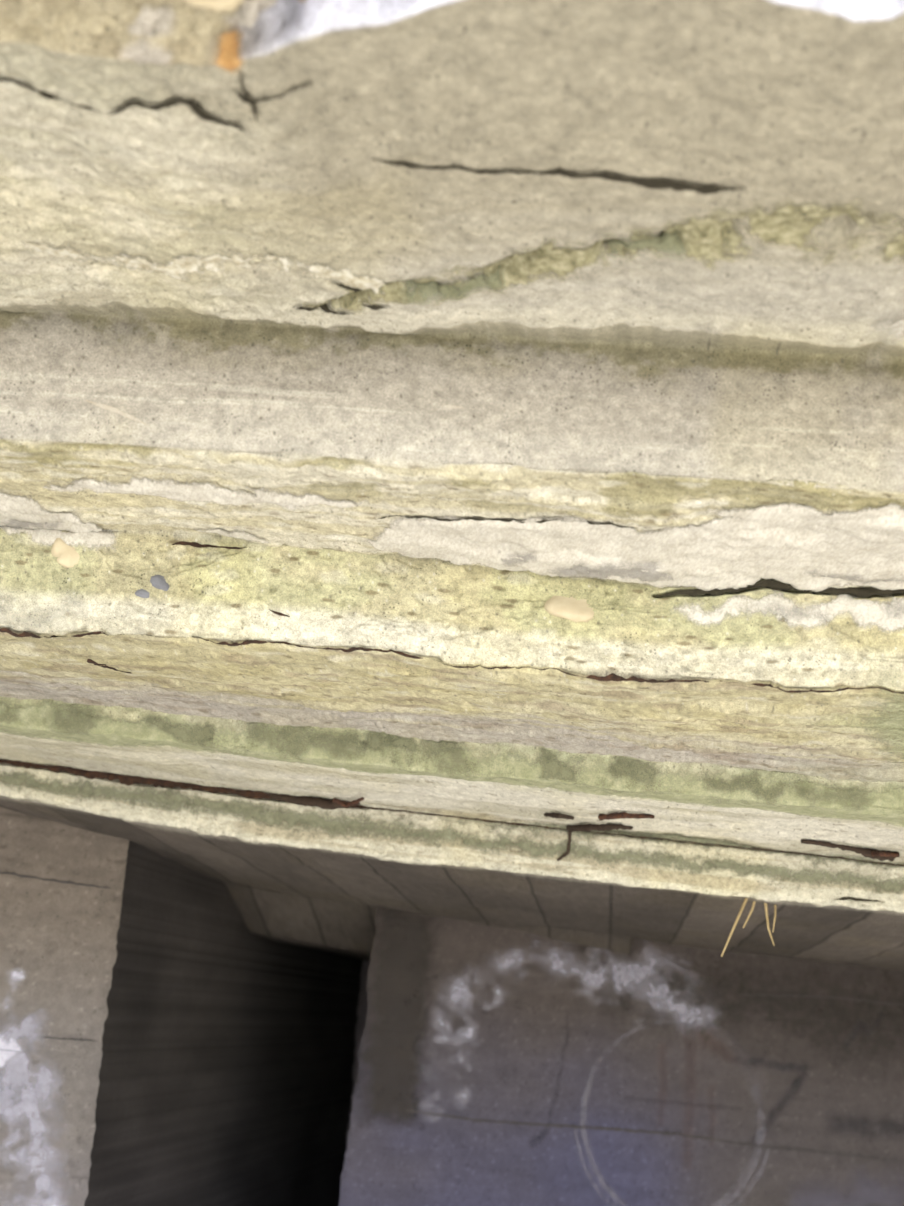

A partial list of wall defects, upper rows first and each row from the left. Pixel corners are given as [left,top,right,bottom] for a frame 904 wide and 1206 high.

spalling [769,0,904,21]
spalling [0,0,457,67]
corrosion [216,31,242,72]
crack [0,74,308,131]
crack [380,161,742,194]
peeling [710,504,829,525]
flaking render [6,520,80,568]
flaking render [135,575,170,598]
peeling [557,563,673,581]
crack [656,579,904,598]
leakage [550,952,904,1052]
leakage [0,1016,59,1206]